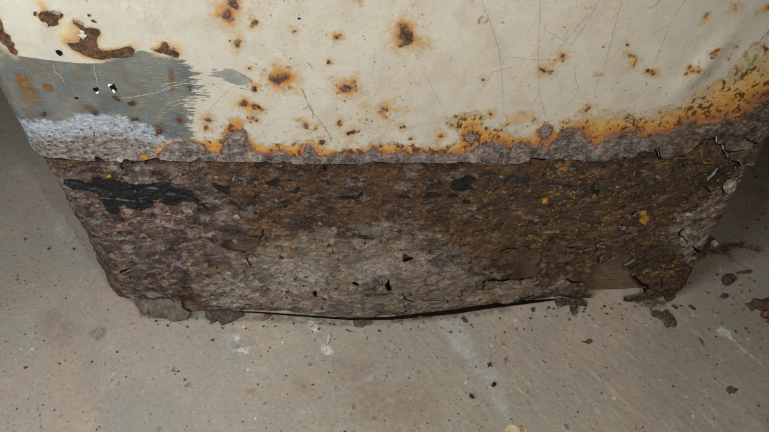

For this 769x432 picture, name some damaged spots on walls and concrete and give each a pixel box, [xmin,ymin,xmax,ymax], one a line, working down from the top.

corrosion [212,0,241,28]
corrosion [391,18,428,53]
corrosion [5,46,769,167]
crack [43,156,195,170]
crack [644,137,757,167]
corrosion [638,210,649,226]
spalling [573,239,639,298]